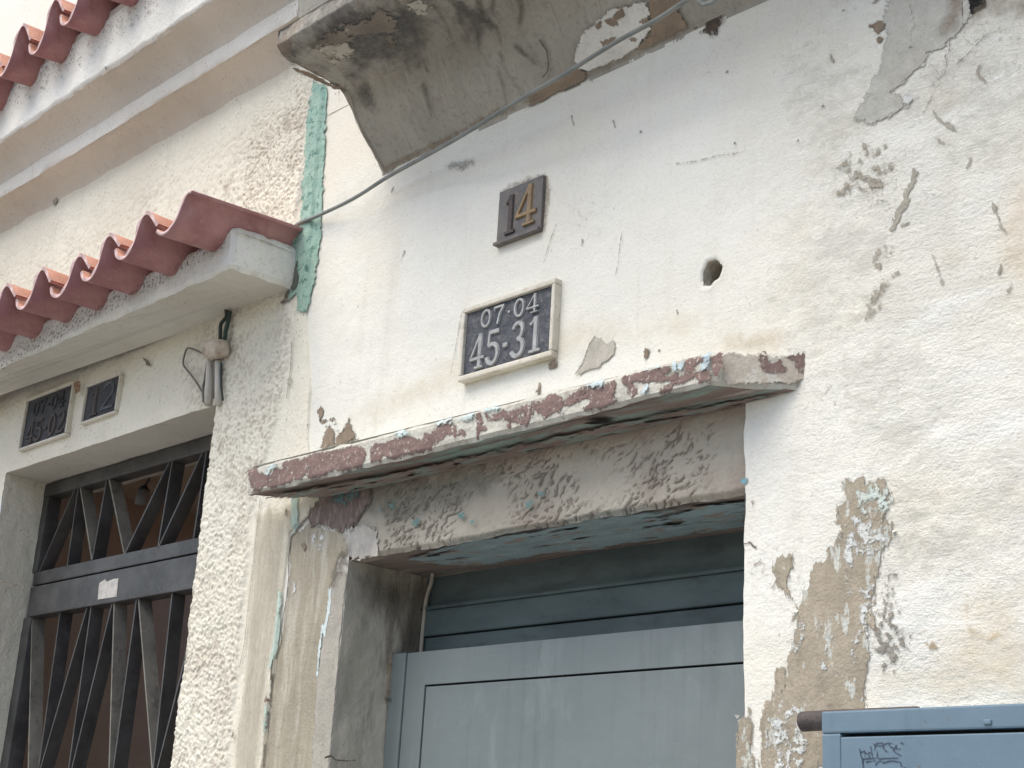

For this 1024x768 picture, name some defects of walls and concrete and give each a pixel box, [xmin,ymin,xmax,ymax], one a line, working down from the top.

water stain [318,10,420,66]
peeling [528,0,688,107]
peeling [854,0,972,130]
flaking render [834,143,894,196]
spalling [889,168,919,232]
flaking render [864,244,899,323]
peeling [245,336,806,768]
peeling [734,476,912,768]